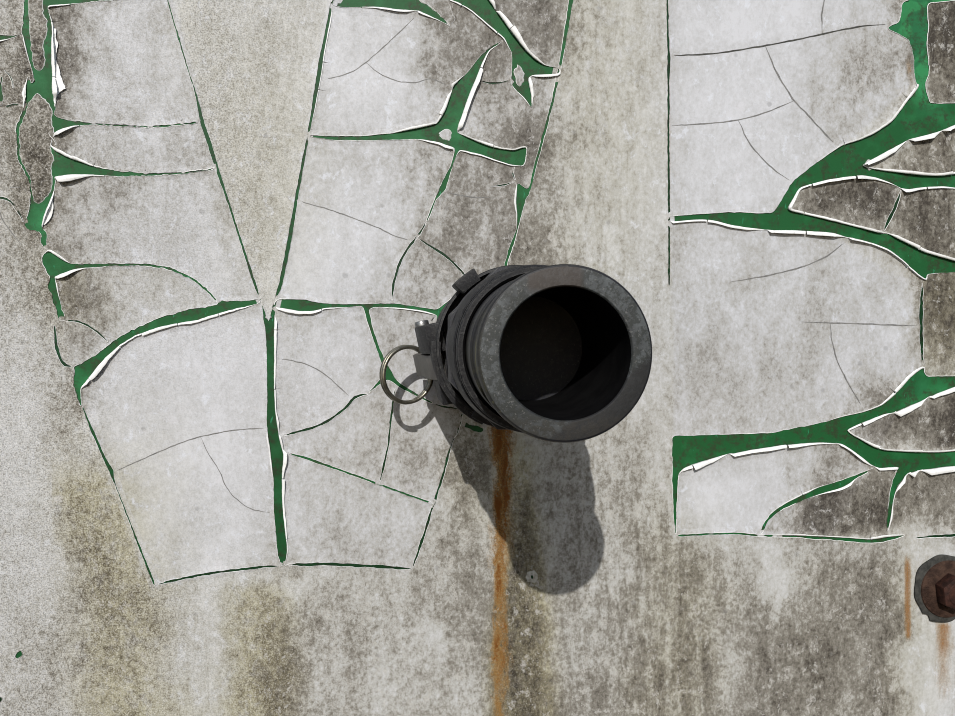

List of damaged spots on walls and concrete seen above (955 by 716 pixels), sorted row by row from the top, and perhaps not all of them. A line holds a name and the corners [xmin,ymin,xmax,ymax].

peeling [0,0,568,570]
peeling [668,0,955,287]
rust [489,426,514,716]
peeling [666,360,955,538]
rust [938,624,948,654]